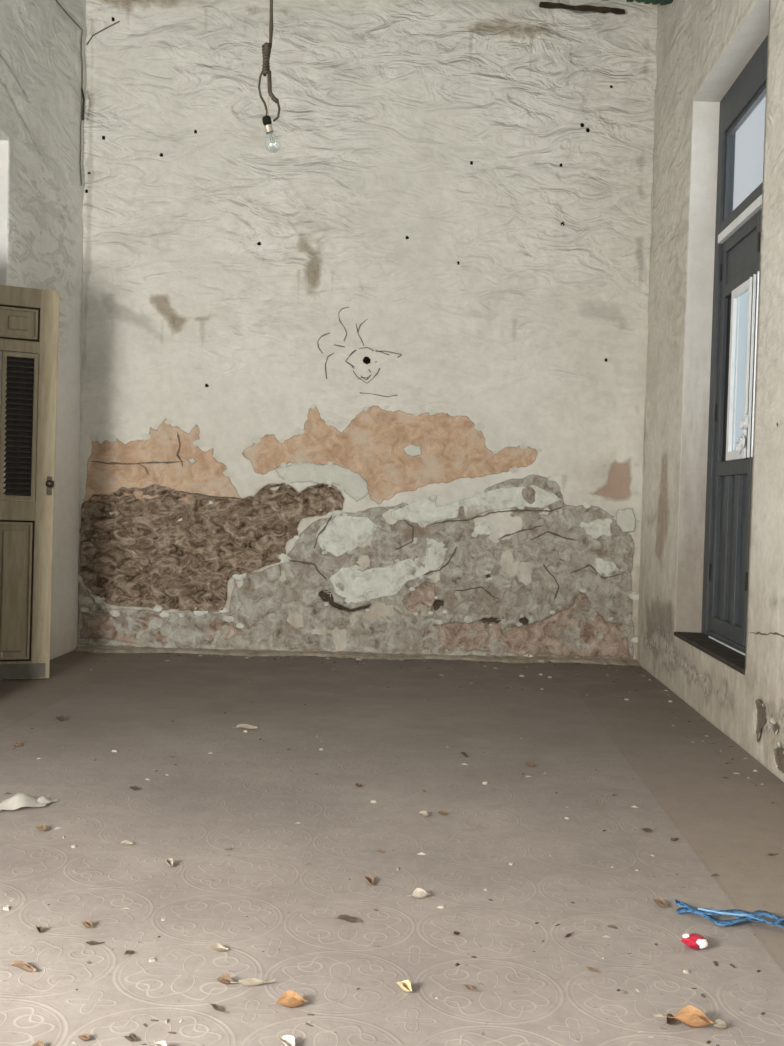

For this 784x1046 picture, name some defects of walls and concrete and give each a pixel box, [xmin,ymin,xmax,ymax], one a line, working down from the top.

flaking render [77,405,640,659]
crack [750,630,784,638]